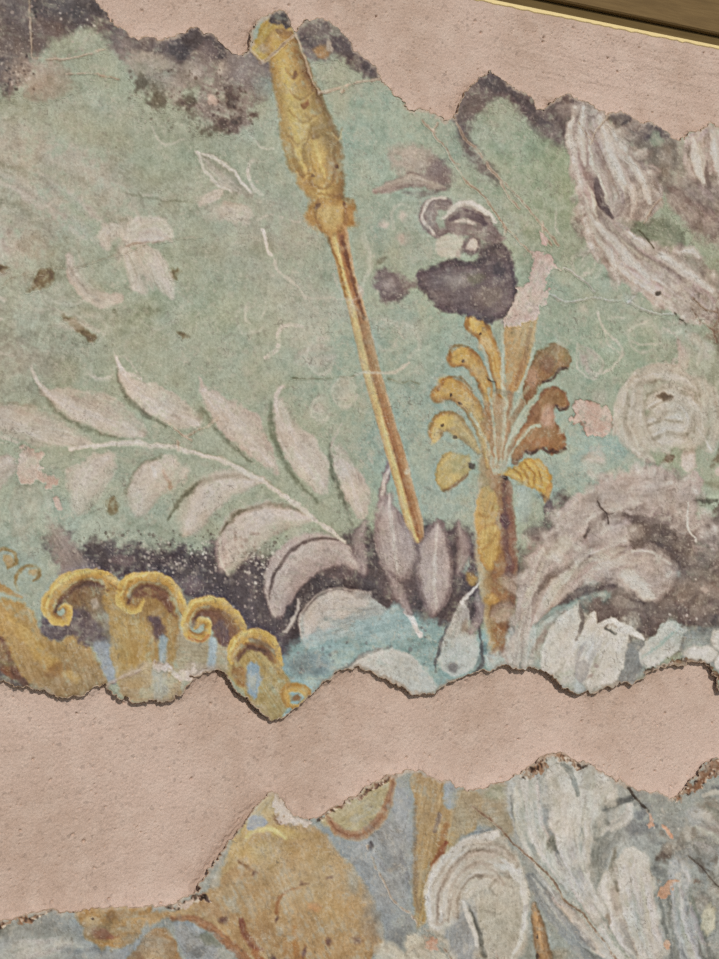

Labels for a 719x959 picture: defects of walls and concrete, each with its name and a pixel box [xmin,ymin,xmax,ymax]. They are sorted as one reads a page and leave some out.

flaking render [502,229,565,329]
flaking render [568,398,615,439]
flaking render [13,443,63,512]
flaking render [152,657,214,682]
spalling [643,656,719,688]
flaking render [271,774,398,829]
spalling [519,752,589,781]
spalling [671,758,719,804]
spalling [0,909,55,930]
spalling [164,891,212,911]
crack [471,805,619,959]